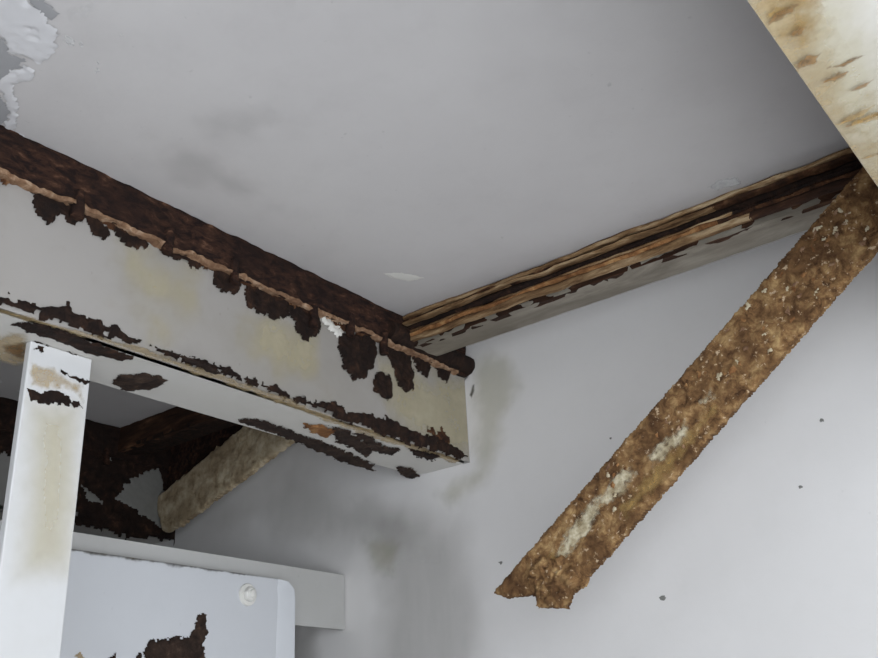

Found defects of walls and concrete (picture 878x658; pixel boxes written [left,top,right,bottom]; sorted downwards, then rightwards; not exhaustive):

peeling [0,0,61,137]
rust [0,292,468,471]
peeling [81,484,103,505]
rust [27,368,176,546]
peeling [115,468,164,528]
rust [396,466,420,479]
rust [606,463,627,520]